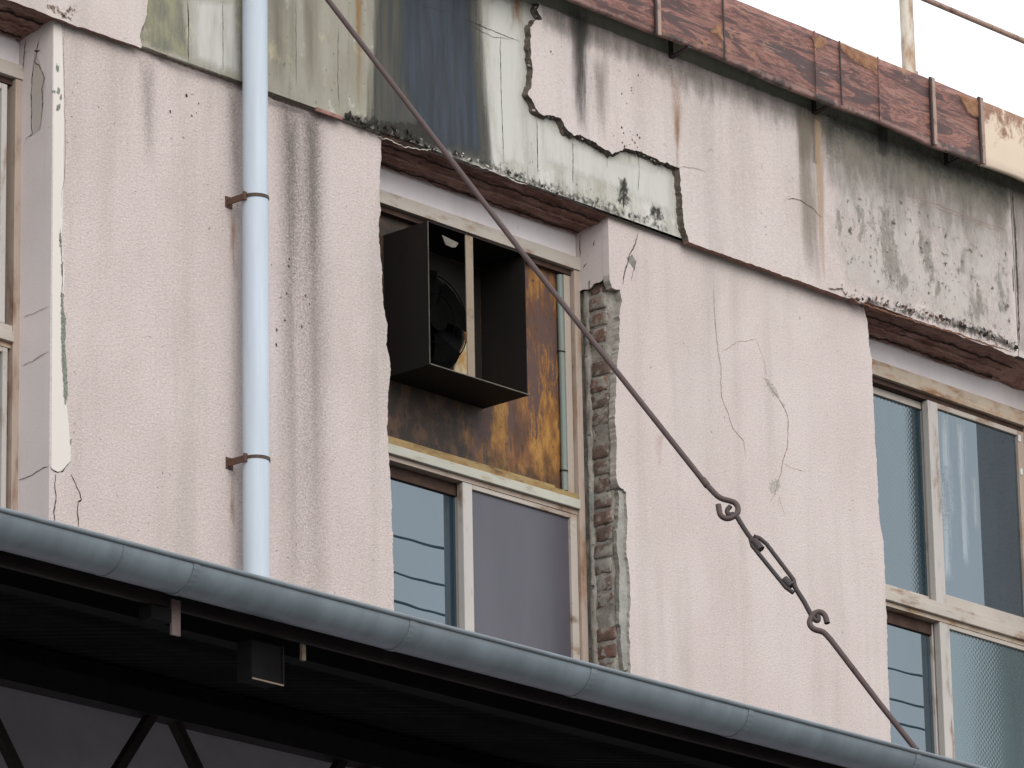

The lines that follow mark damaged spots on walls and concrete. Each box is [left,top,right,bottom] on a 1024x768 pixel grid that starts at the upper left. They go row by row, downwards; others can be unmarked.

crack [23,35,45,142]
spalling [140,0,242,85]
spalling [268,0,688,241]
water stain [348,0,664,228]
water stain [801,117,1024,229]
crack [19,462,82,526]
spalling [580,283,629,672]
crack [714,300,801,514]